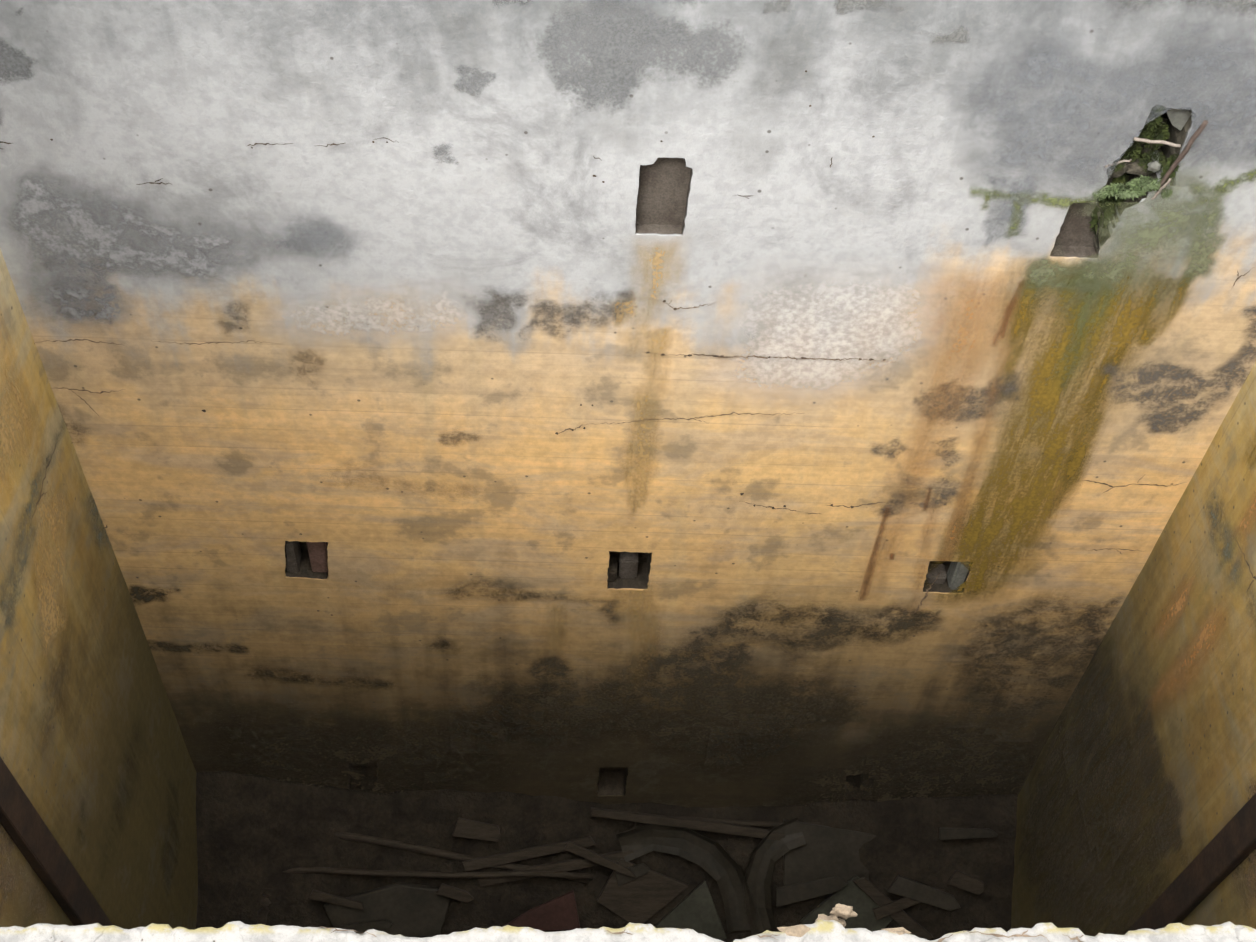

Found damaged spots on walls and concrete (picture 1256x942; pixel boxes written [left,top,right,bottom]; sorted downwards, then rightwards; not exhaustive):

spalling [1089,105,1208,252]
leakage [479,292,628,334]
crack [640,351,903,365]
leakage [1104,308,1256,433]
crack [555,404,803,435]
leakage [916,380,1018,421]
leakage [219,602,937,795]